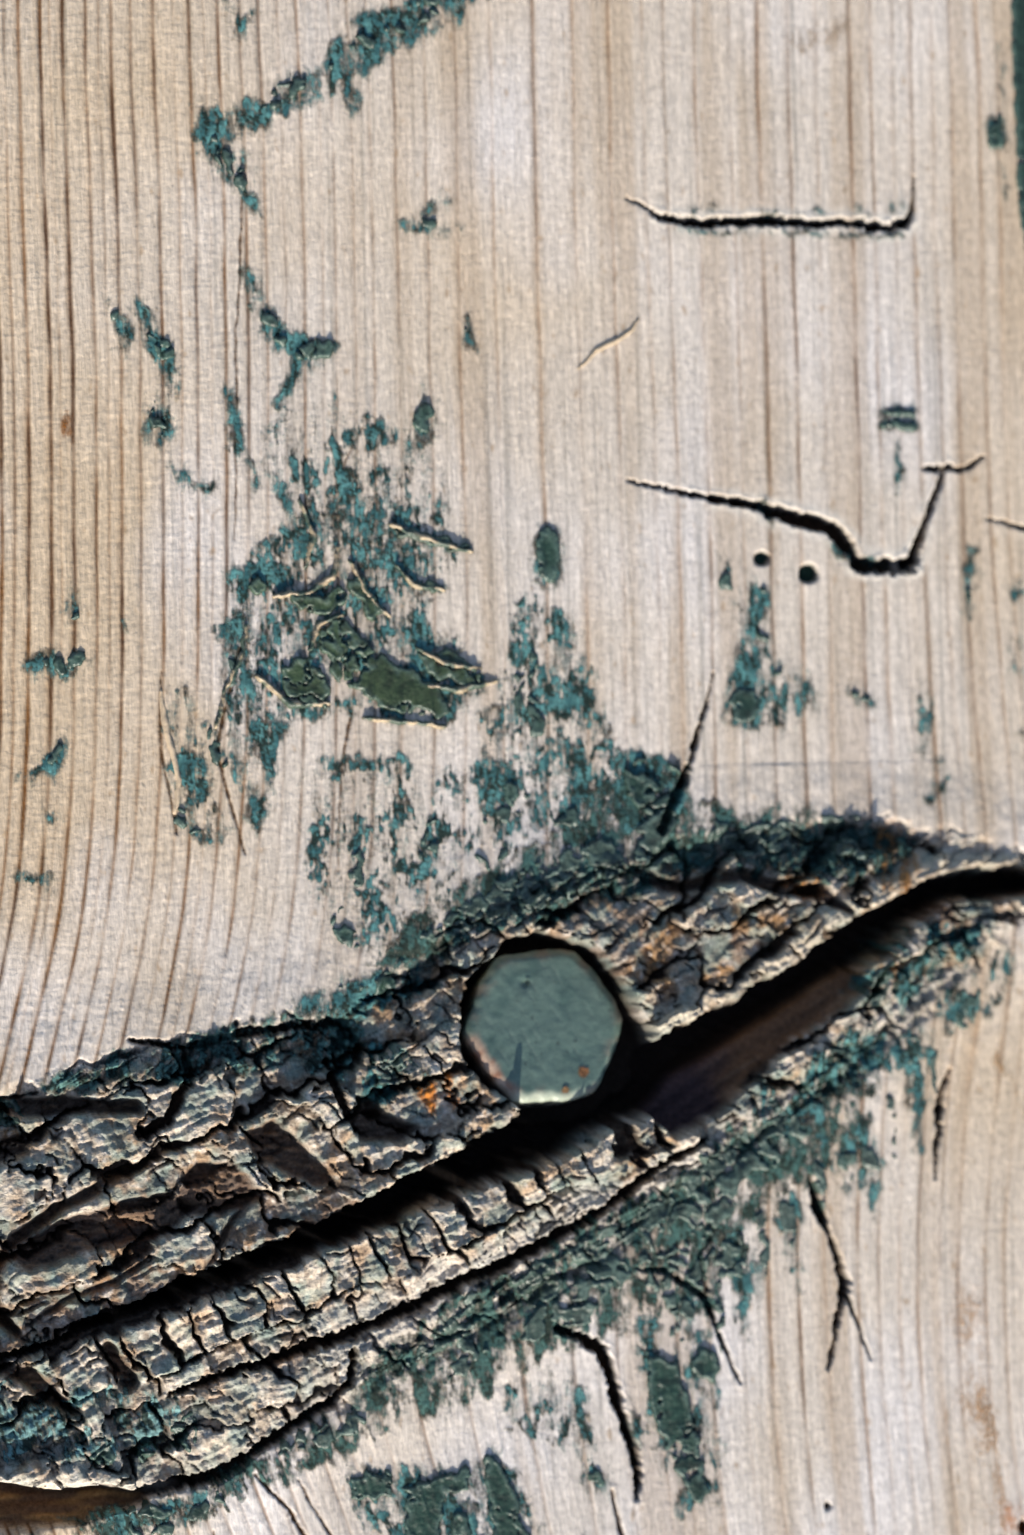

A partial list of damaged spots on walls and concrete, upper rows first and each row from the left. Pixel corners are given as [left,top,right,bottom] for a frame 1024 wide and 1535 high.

peeling [192,0,475,217]
crack [634,177,916,233]
peeling [108,296,180,391]
peeling [238,267,340,433]
crack [629,456,983,574]
peeling [41,386,919,1105]
crack [673,689,710,790]
crack [0,864,1024,1367]
peeling [68,920,1013,1535]
crack [136,1137,708,1535]
crack [637,1246,740,1382]
peeling [0,1378,198,1475]